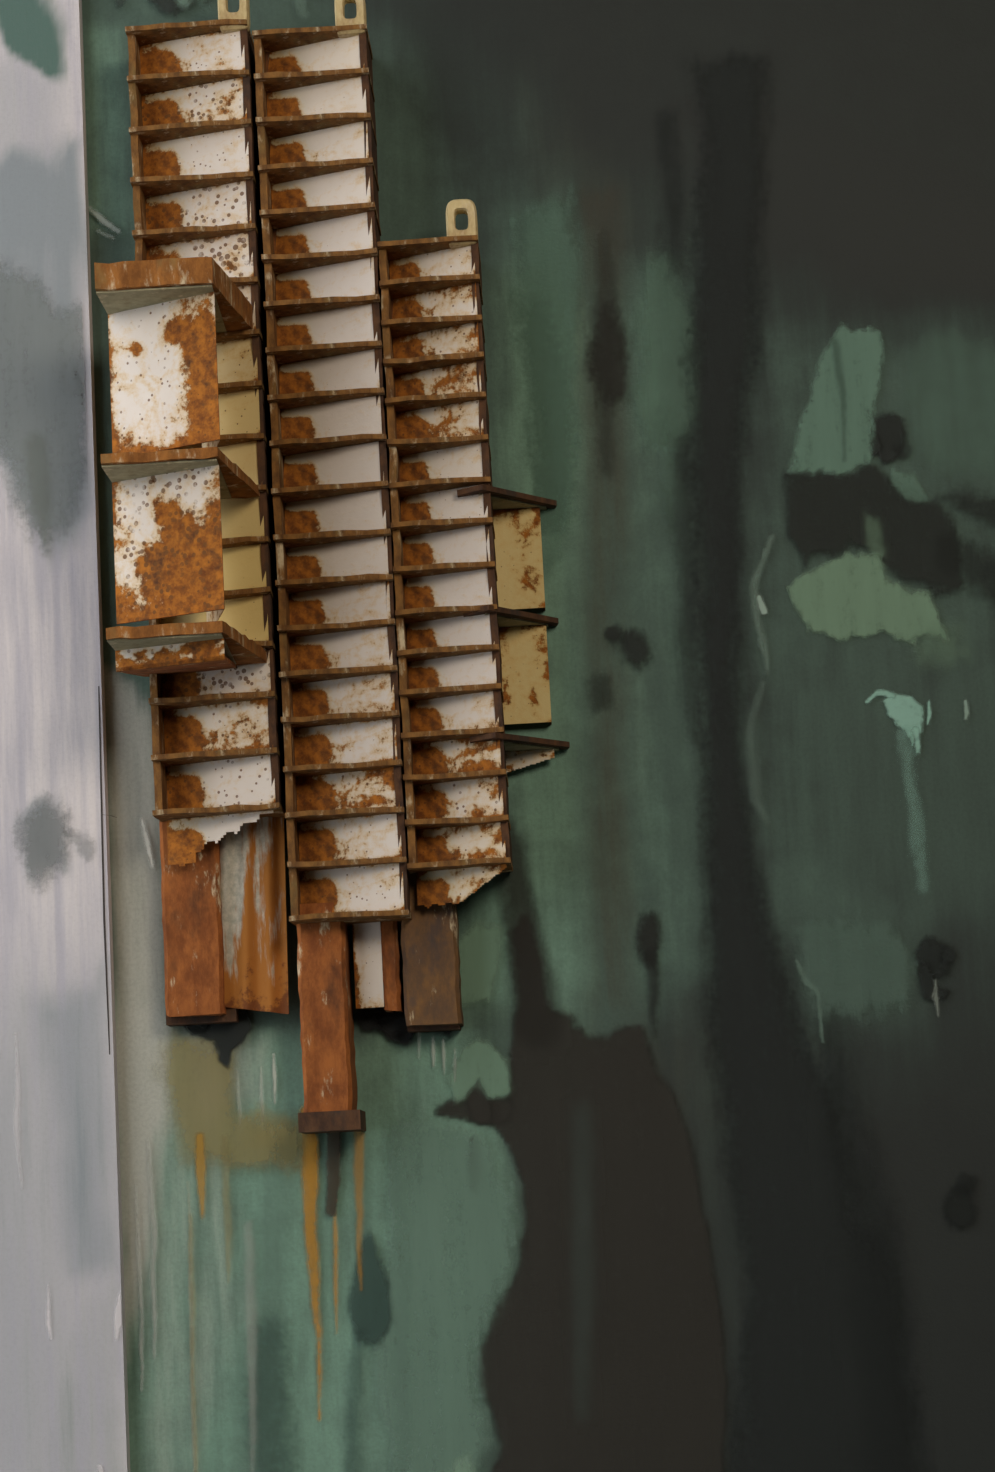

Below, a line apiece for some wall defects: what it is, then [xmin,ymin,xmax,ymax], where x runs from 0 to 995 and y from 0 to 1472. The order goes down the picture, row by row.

damp [0,272,86,535]
damp [23,804,66,881]
damp [349,57,995,1472]
damp [184,1009,252,1067]
corrosion [167,1039,338,1420]
corrosion [355,1131,363,1269]